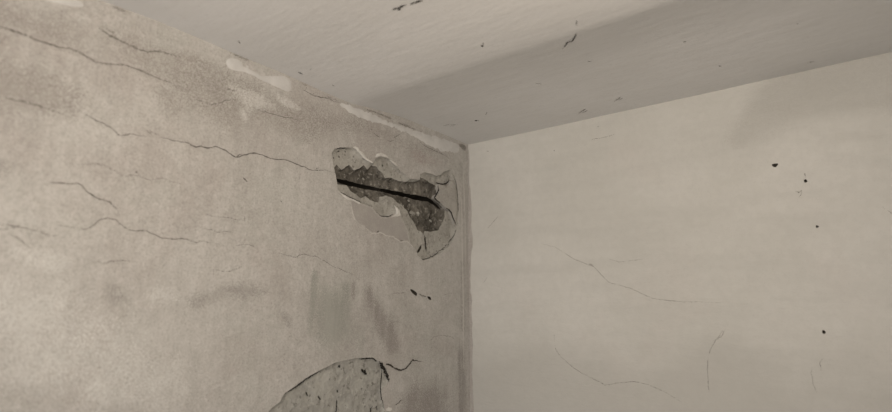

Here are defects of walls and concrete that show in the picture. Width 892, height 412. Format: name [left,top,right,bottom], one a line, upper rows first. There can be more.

crack [2,27,236,105]
crack [5,97,330,172]
crack [0,163,252,249]
flaking render [332,146,459,260]
flaking render [269,357,423,412]